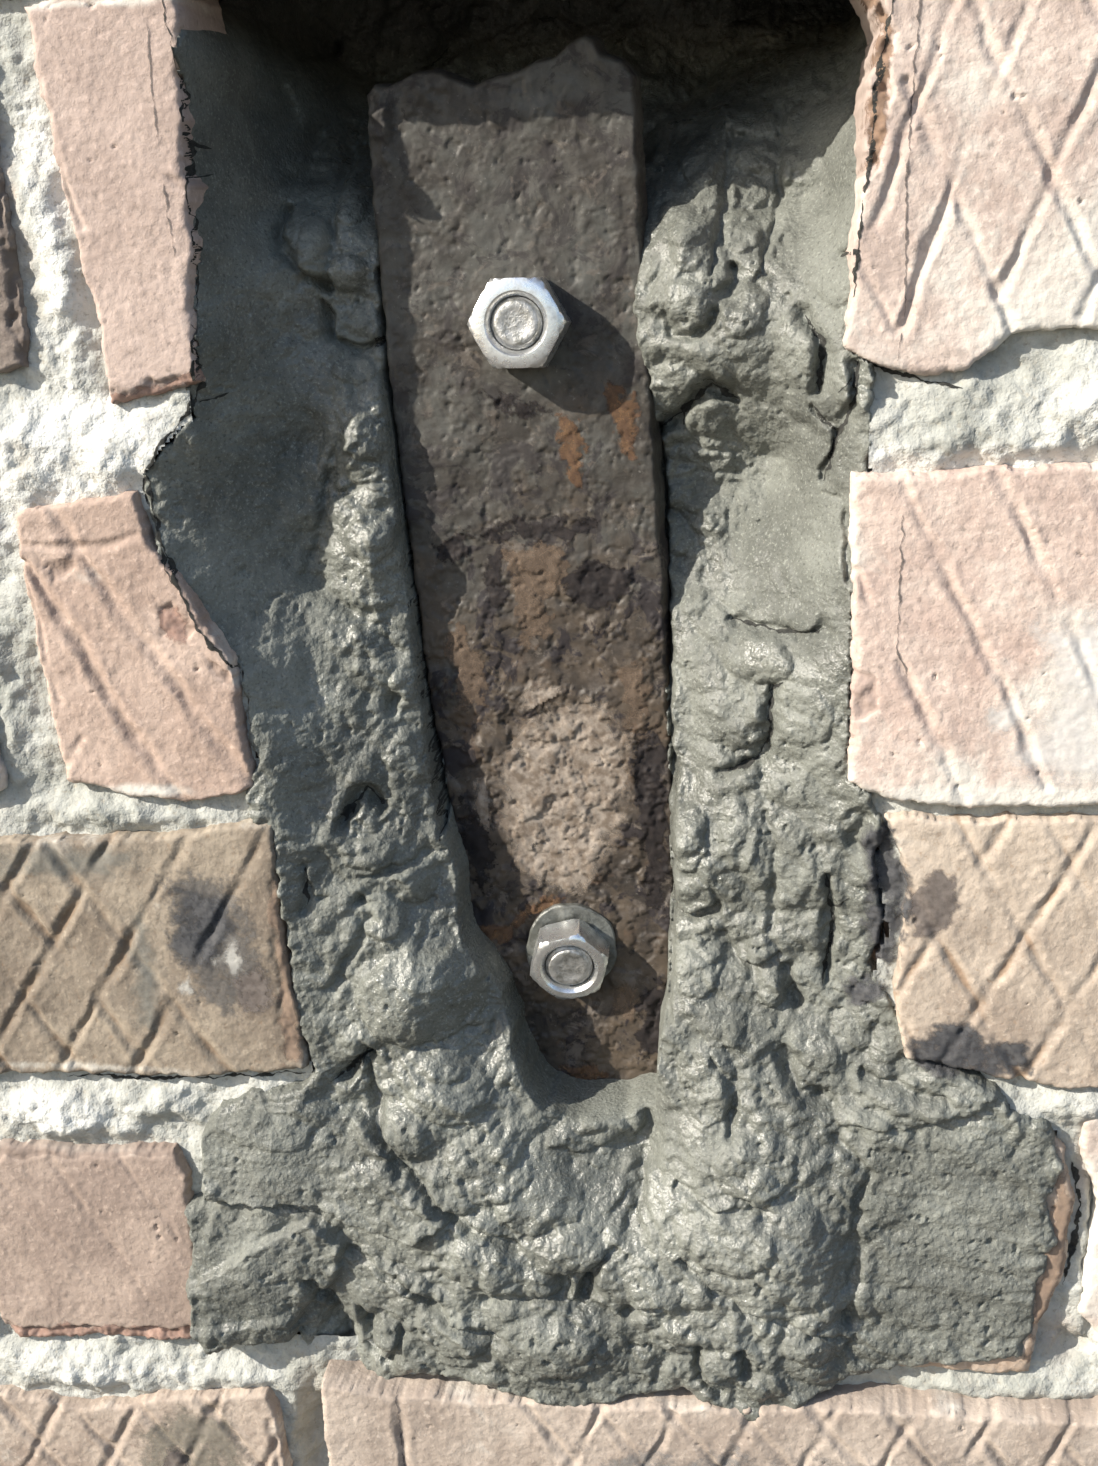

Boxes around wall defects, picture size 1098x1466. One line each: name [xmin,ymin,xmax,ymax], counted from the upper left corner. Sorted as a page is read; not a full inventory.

crack [805,0,963,481]
corrosion [555,413,589,487]
corrosion [603,380,641,461]
corrosion [443,621,489,712]
corrosion [501,539,570,652]
corrosion [614,657,653,731]
crack [726,682,783,770]
crack [729,617,827,633]
corrosion [479,895,564,944]
crack [822,874,849,985]